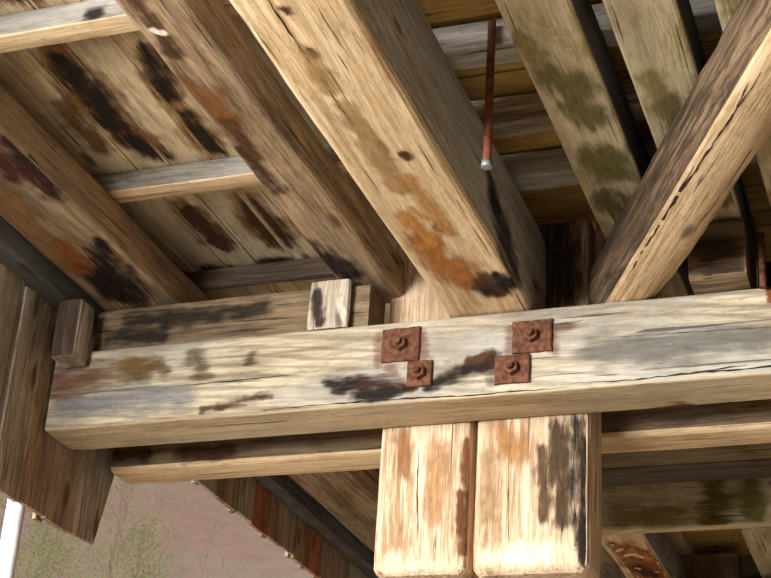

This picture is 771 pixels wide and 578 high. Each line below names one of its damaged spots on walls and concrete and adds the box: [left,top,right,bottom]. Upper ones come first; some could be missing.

water stain [38,43,174,162]
mould [512,30,605,132]
mould [579,144,636,217]
crack [626,73,761,277]
water stain [482,414,589,568]